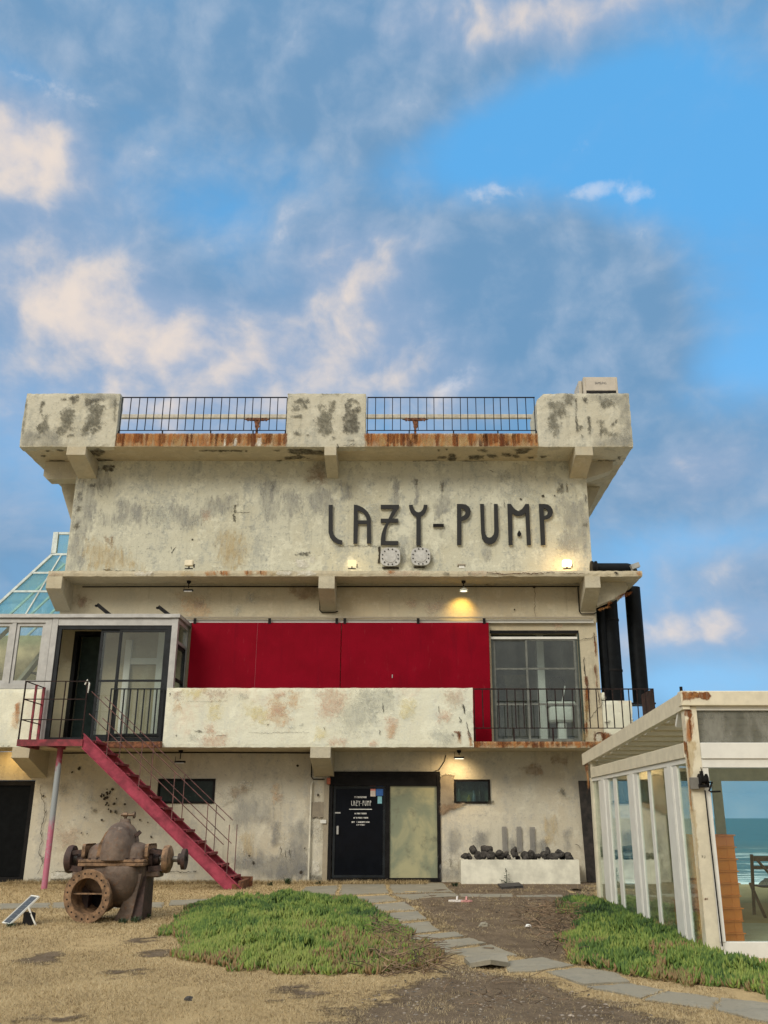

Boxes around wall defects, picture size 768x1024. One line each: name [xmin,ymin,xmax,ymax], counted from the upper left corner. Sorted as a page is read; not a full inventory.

corrosion [115,433,287,446]
corrosion [365,433,538,446]
corrosion [454,731,600,748]
corrosion [683,692,711,811]
crack [38,787,47,872]